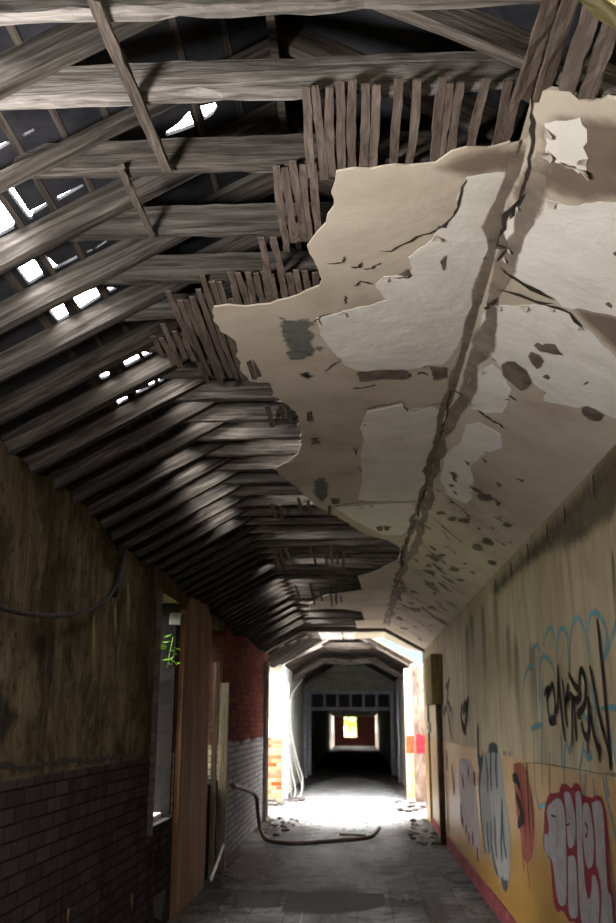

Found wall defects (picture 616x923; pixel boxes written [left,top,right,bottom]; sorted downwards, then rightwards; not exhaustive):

crack [313,180,467,326]
peeling [316,172,616,421]
crack [484,113,584,330]
peeling [540,117,590,181]
peeling [336,404,512,551]
crack [354,384,503,443]
damp [383,122,616,626]
crack [335,489,464,621]
flaking render [394,545,475,641]